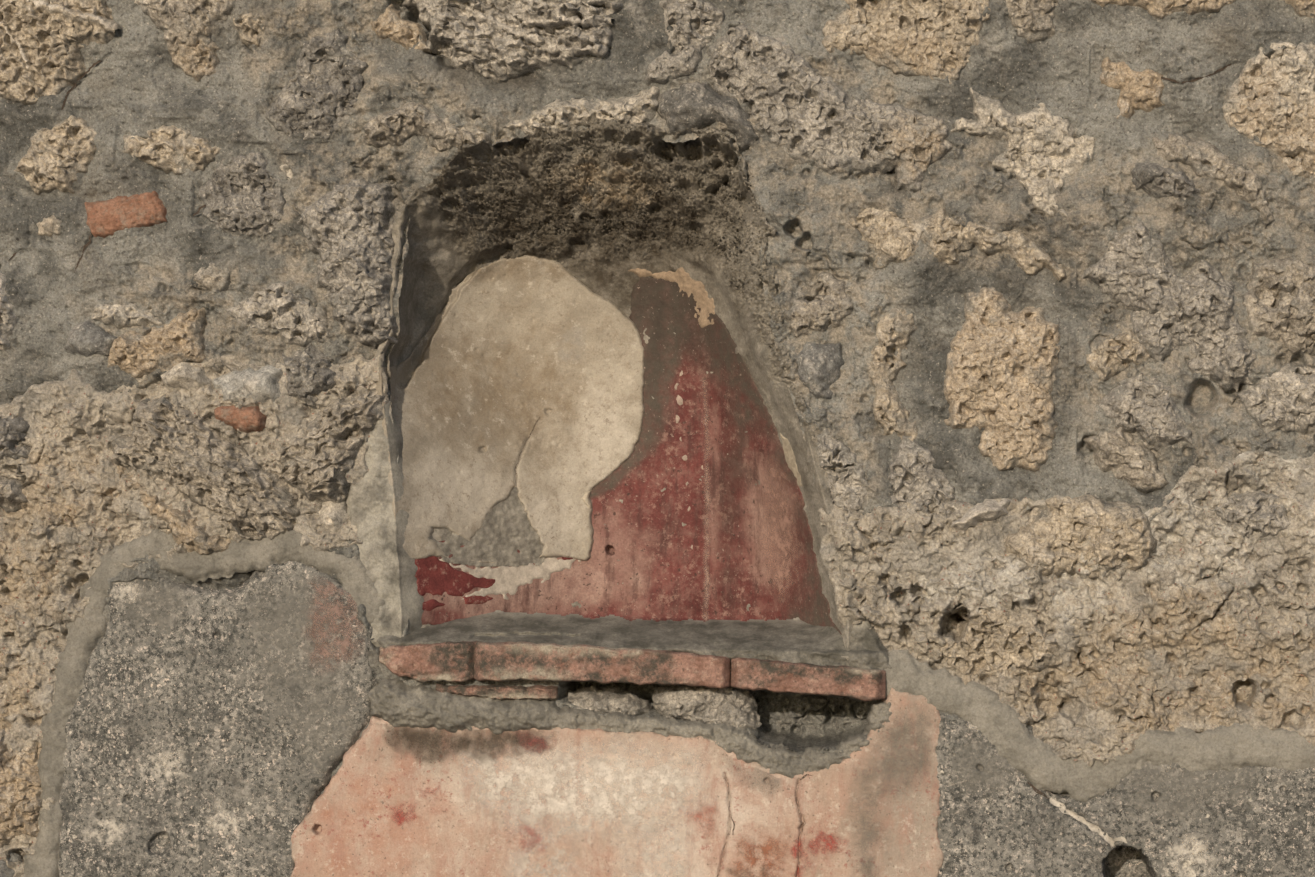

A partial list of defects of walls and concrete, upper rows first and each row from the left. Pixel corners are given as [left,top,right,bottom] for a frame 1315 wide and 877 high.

spalling [415,487,588,611]
crack [717,778,735,877]
crack [796,774,812,877]